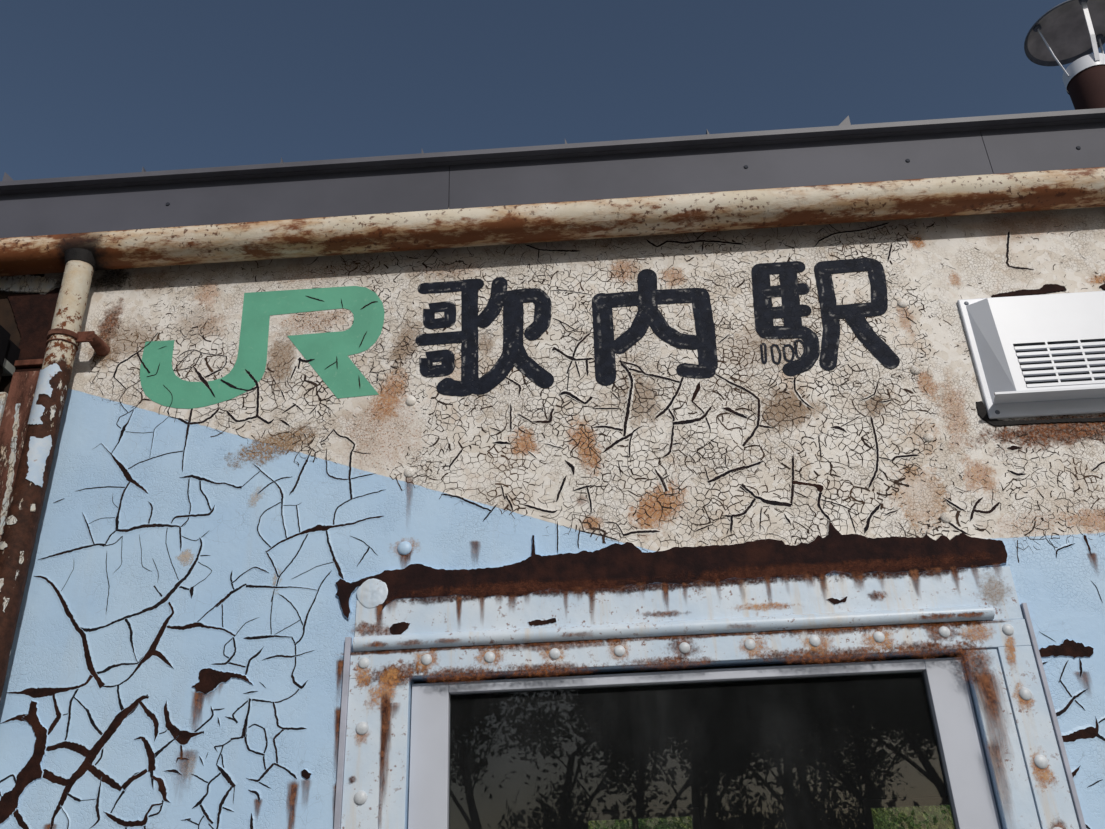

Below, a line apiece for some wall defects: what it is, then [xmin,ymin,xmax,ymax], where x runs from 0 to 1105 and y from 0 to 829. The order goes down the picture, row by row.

rust [88,269,168,365]
peeling [0,275,62,550]
crack [0,212,1105,829]
rust [631,482,685,536]
peeling [335,522,1007,620]
rust [193,692,204,721]
peeling [192,667,254,695]
rust [337,553,1005,792]
rust [1005,637,1015,662]
peeling [1039,638,1094,659]
peeling [0,700,49,827]
rust [288,781,308,829]